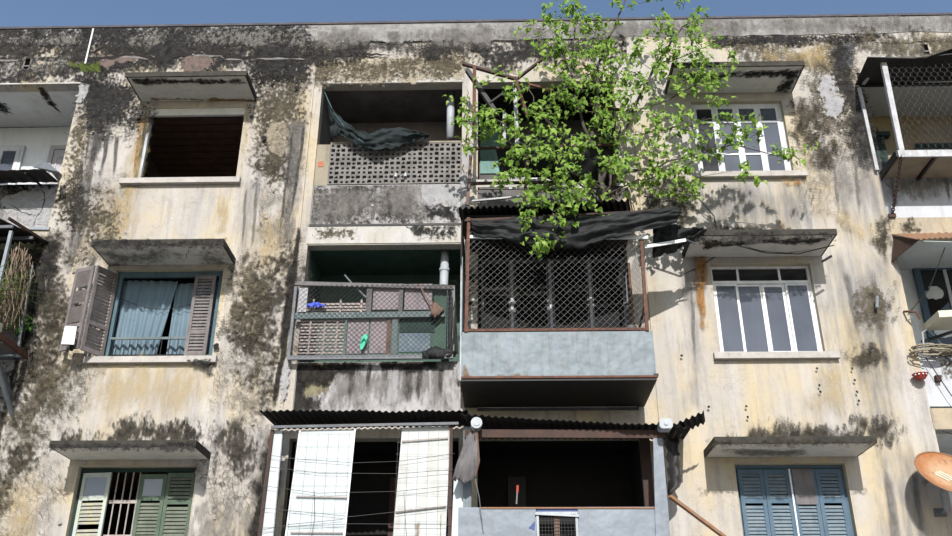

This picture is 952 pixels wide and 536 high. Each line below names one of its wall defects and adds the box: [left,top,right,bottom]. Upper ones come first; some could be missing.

water stain [671,15,918,203]
water stain [644,175,694,226]
water stain [0,21,666,489]
water stain [693,224,833,249]
water stain [858,215,921,256]
rust [694,256,707,327]
water stain [844,275,900,369]
water stain [708,414,904,457]
peeling [0,472,17,515]
water stain [191,420,270,536]
water stain [886,474,898,536]
water stain [913,476,928,536]